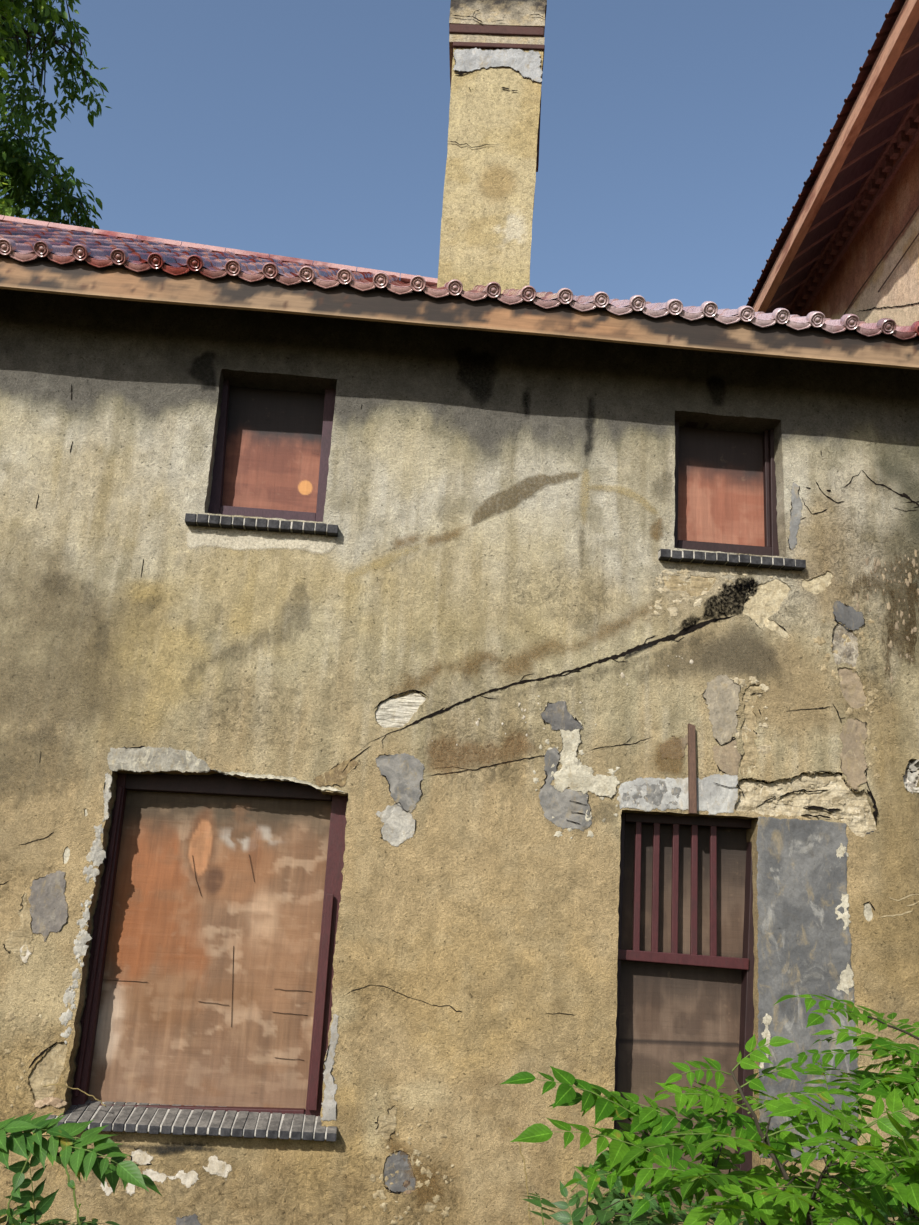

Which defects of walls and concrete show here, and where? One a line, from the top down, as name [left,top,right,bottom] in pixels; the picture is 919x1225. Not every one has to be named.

leakage [585,398,595,452]
leakage [473,472,578,523]
crack [788,451,919,549]
efflorescence [187,528,336,553]
leakage [852,556,919,670]
spalling [373,690,429,728]
crack [343,614,737,833]
spalling [730,550,919,838]
spalling [220,758,362,792]
crack [715,736,742,788]
peeling [3,809,106,1108]
crack [347,985,462,1012]